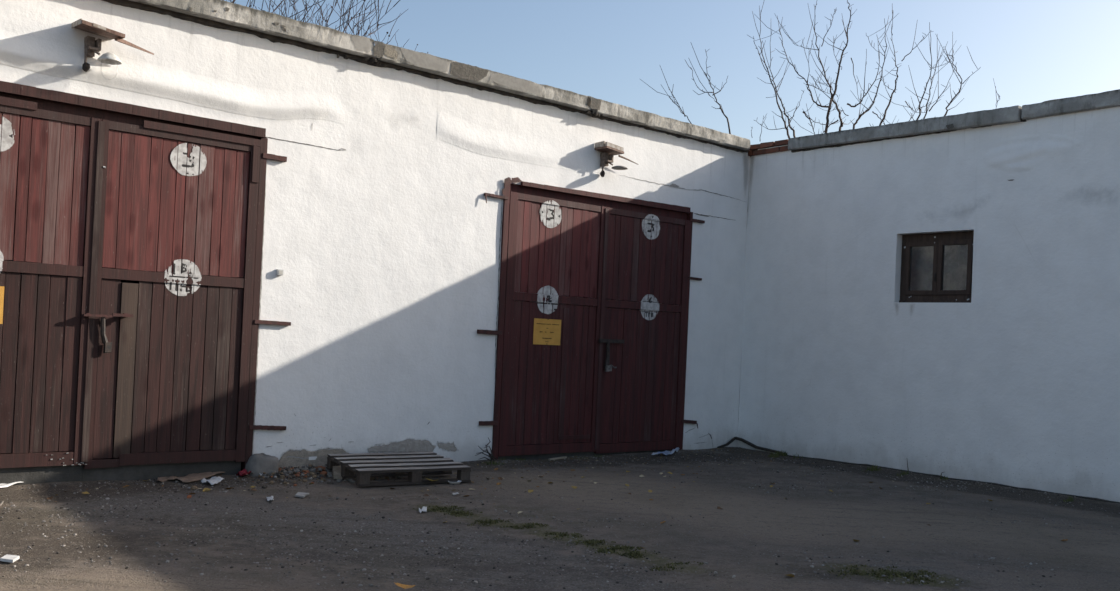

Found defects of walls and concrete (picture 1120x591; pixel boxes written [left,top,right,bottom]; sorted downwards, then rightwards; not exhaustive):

spalling [368,439,456,453]
spalling [278,448,349,471]